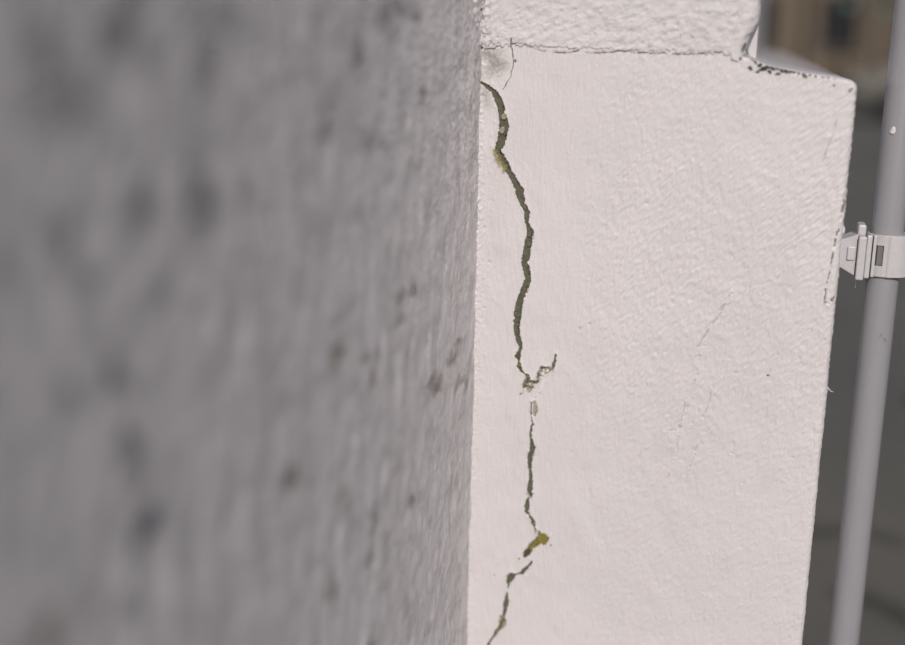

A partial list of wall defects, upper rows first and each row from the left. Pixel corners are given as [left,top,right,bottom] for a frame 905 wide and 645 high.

crack [481,38,759,534]
crack [487,561,532,645]